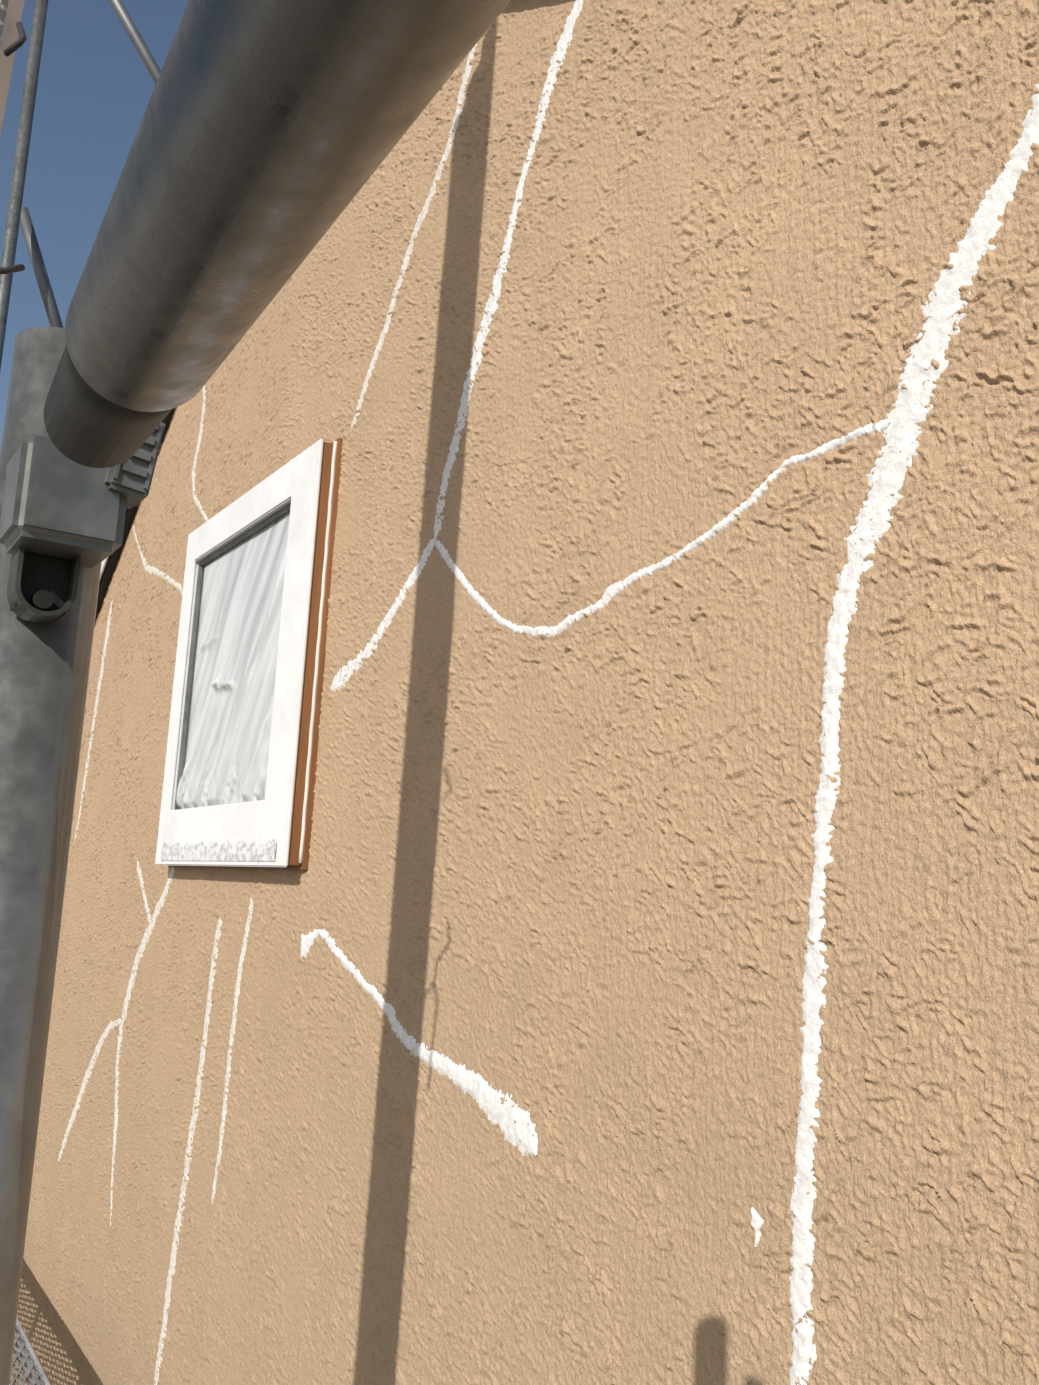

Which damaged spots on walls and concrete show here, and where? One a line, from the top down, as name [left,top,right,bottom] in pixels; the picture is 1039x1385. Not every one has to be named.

crack [331,0,1039,1385]
crack [58,861,174,1226]
crack [154,898,253,1385]